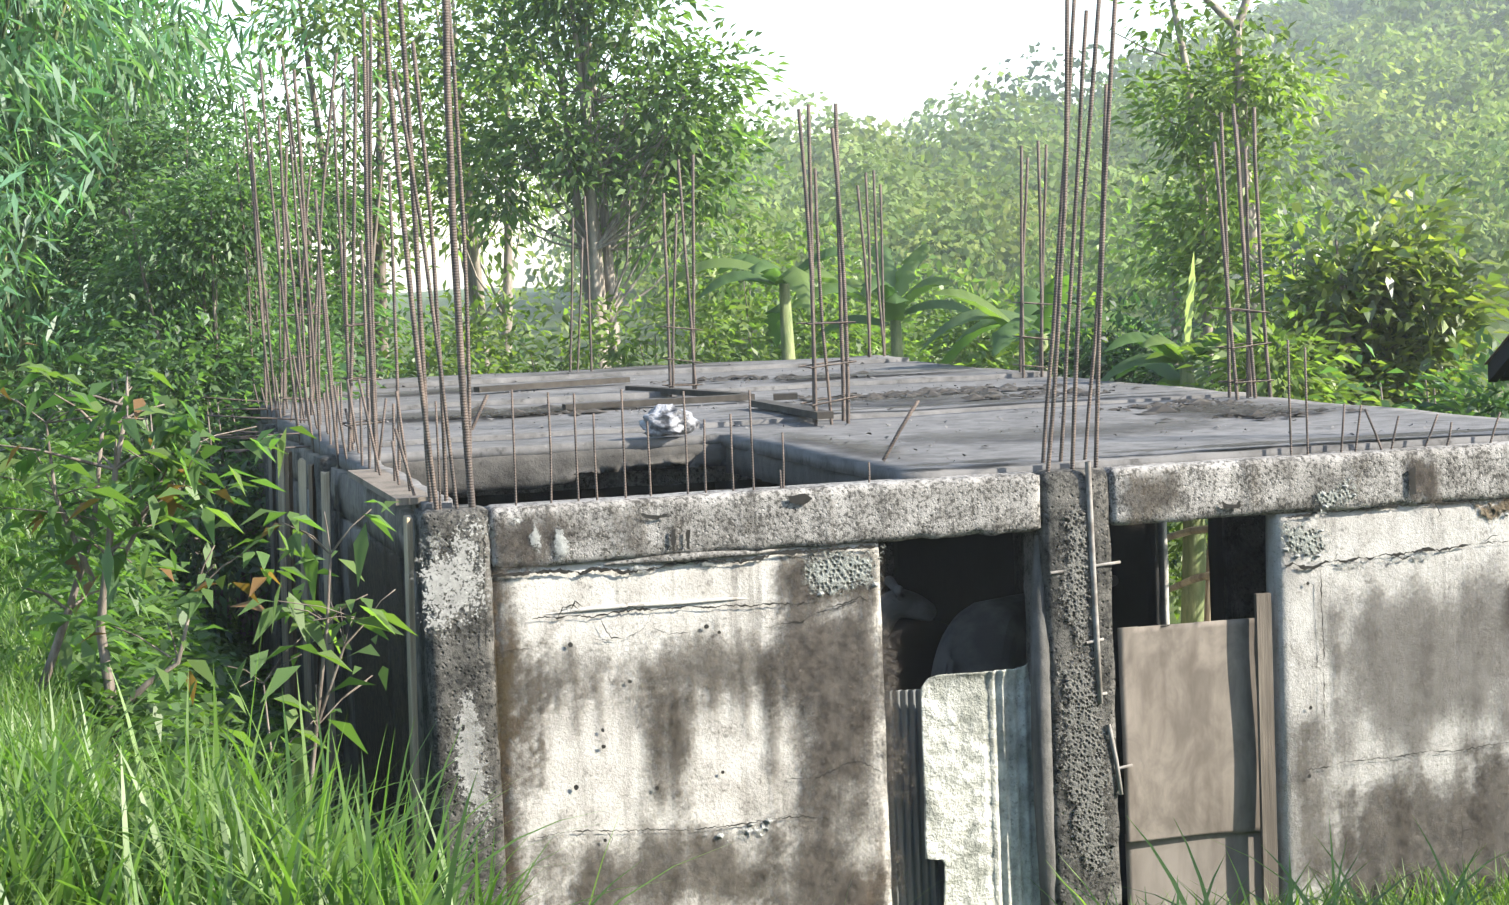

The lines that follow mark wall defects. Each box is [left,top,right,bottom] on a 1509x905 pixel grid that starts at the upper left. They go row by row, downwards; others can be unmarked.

crack [479,534,880,653]
water stain [451,517,913,905]
crack [1285,496,1509,770]
water stain [1314,572,1509,903]